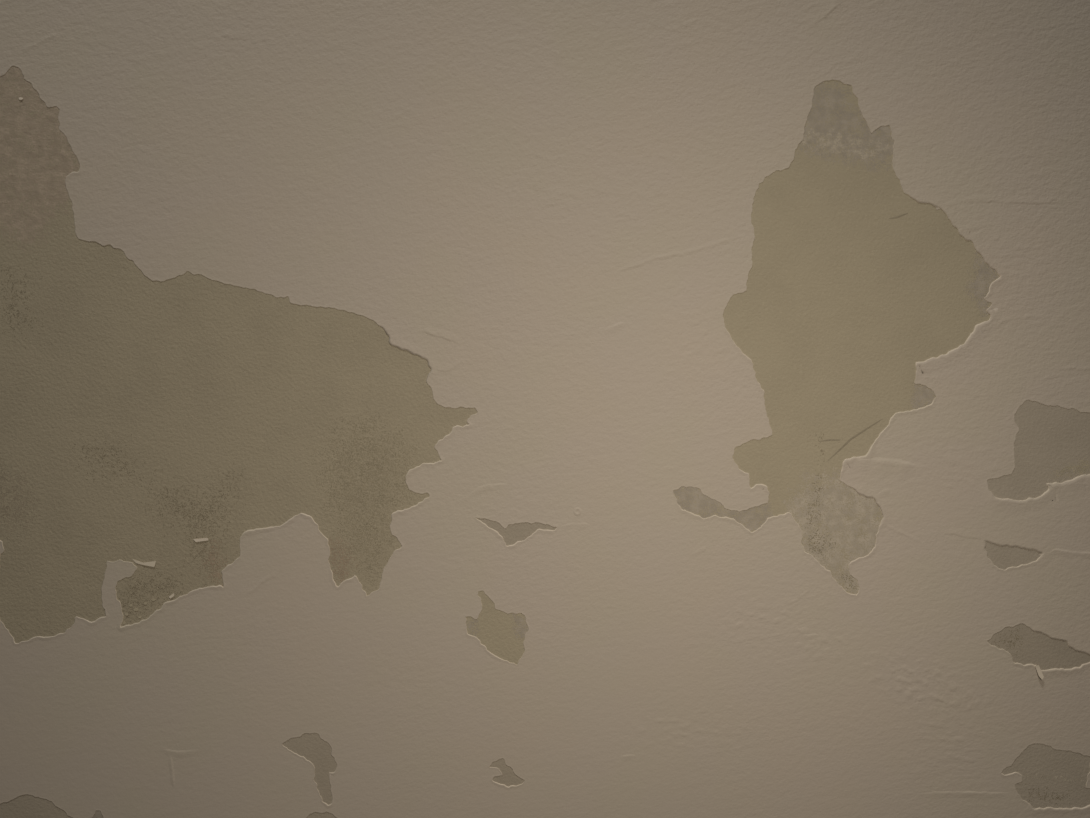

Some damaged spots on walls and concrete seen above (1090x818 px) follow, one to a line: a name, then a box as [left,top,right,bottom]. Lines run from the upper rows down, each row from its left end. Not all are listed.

peeling [0,64,479,647]
peeling [672,78,1010,599]
peeling [984,398,1090,514]
peeling [473,515,560,550]
peeling [975,530,1053,573]
peeling [464,589,531,667]
peeling [984,622,1090,680]
peeling [0,793,105,818]
peeling [281,731,339,818]
peeling [488,757,526,790]
peeling [997,742,1090,817]